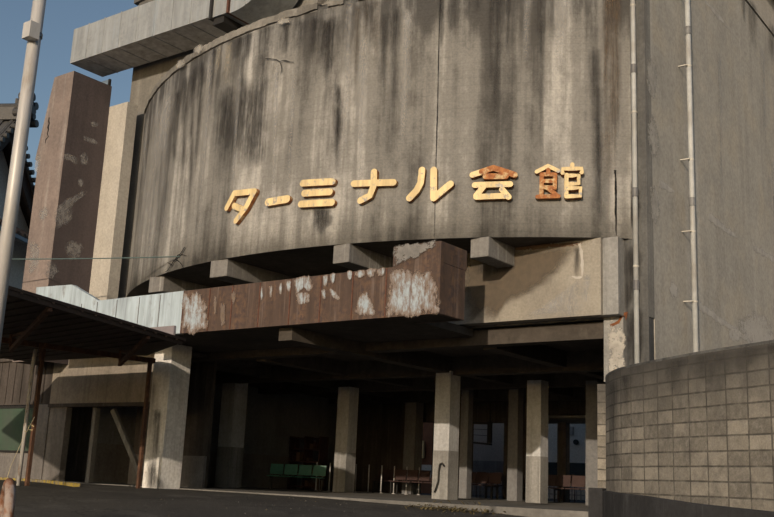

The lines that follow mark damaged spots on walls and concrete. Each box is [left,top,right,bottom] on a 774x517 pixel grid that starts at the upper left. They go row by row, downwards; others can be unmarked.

peeling [40,180,83,225]
peeling [261,273,340,305]
peeling [347,240,441,318]
peeling [181,291,236,335]
peeling [608,317,626,372]